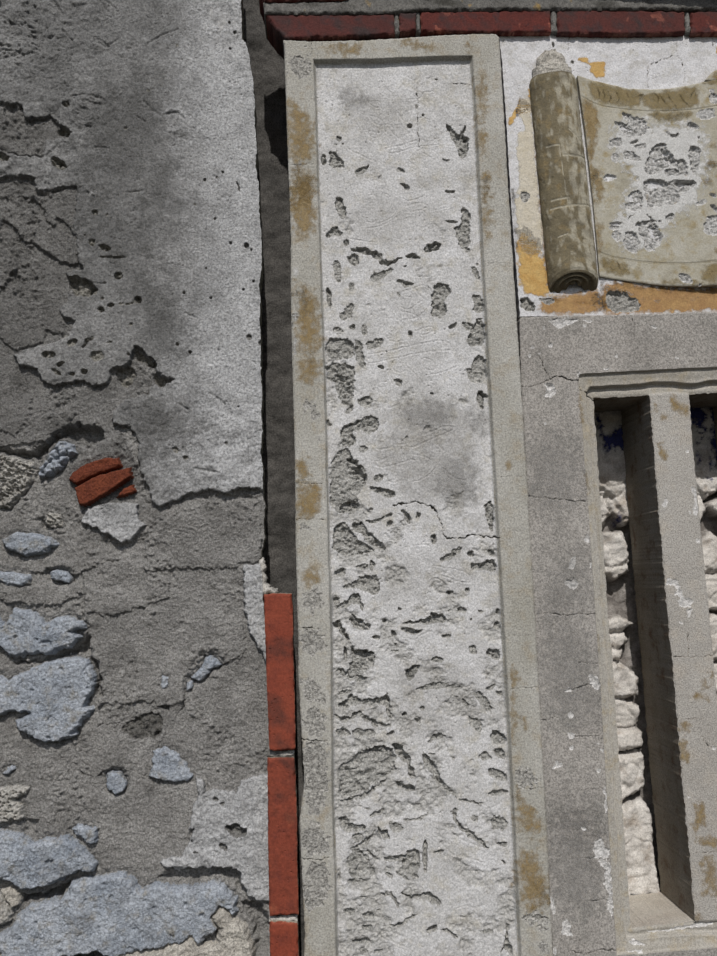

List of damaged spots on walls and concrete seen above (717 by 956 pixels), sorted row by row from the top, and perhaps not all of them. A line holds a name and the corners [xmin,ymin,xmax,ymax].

water stain [287,100,316,235]
peeling [509,89,544,257]
peeling [570,58,717,274]
spalling [520,297,554,312]
spalling [600,287,641,314]
water stain [291,289,321,382]
crack [392,501,499,539]
spalling [121,705,170,740]
spalling [219,823,247,851]
water stain [695,805,705,829]
water stain [515,853,544,910]
spalling [593,837,614,917]